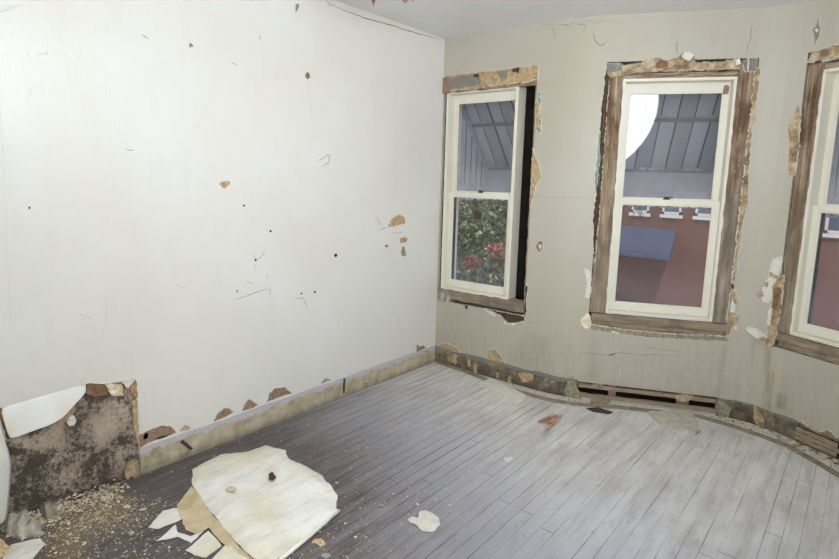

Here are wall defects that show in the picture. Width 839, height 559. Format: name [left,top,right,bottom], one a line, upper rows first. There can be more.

flaking render [806,17,839,64]
flaking render [787,106,802,176]
flaking render [580,52,785,349]
peeling [242,387,292,411]
leakage [0,378,141,528]
peeling [138,425,191,448]
spalling [795,420,839,458]